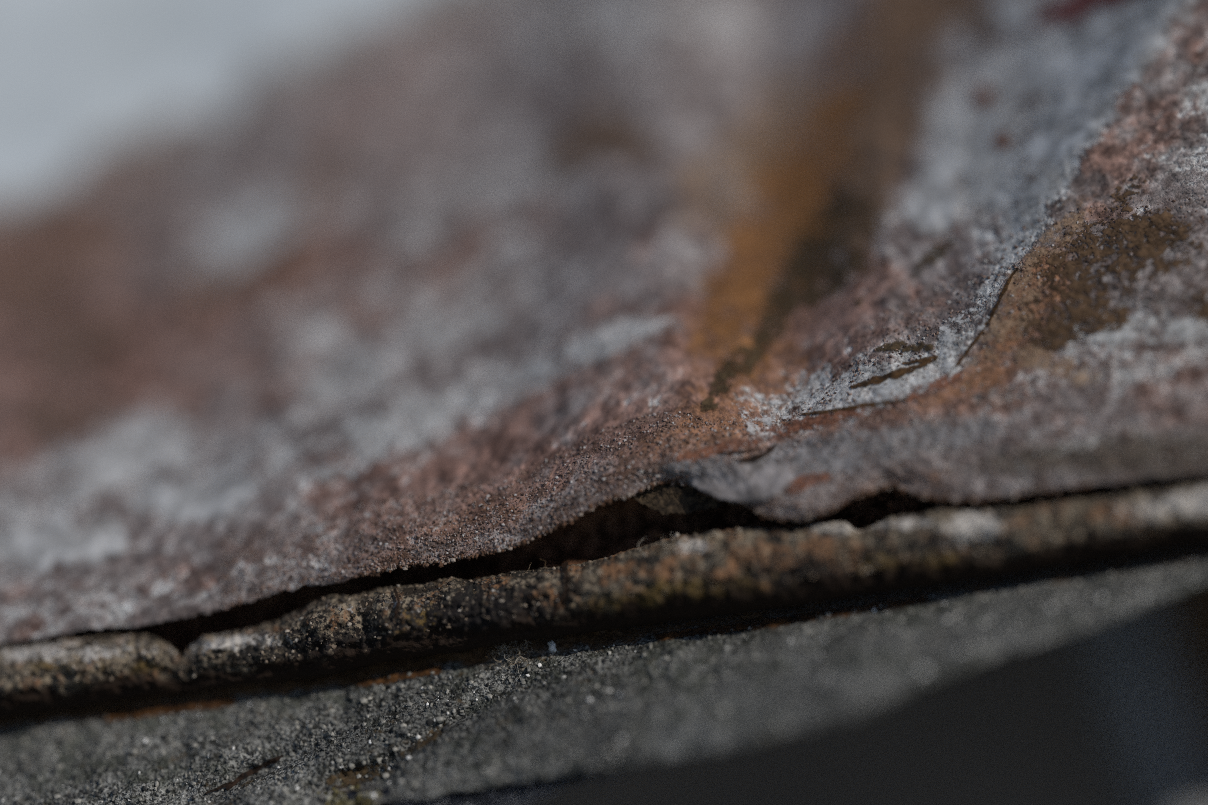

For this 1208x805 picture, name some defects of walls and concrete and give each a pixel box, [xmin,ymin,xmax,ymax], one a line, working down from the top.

corrosion [676,213,1099,463]
peeling [685,463,797,502]
corrosion [655,597,929,640]
corrosion [102,697,236,722]